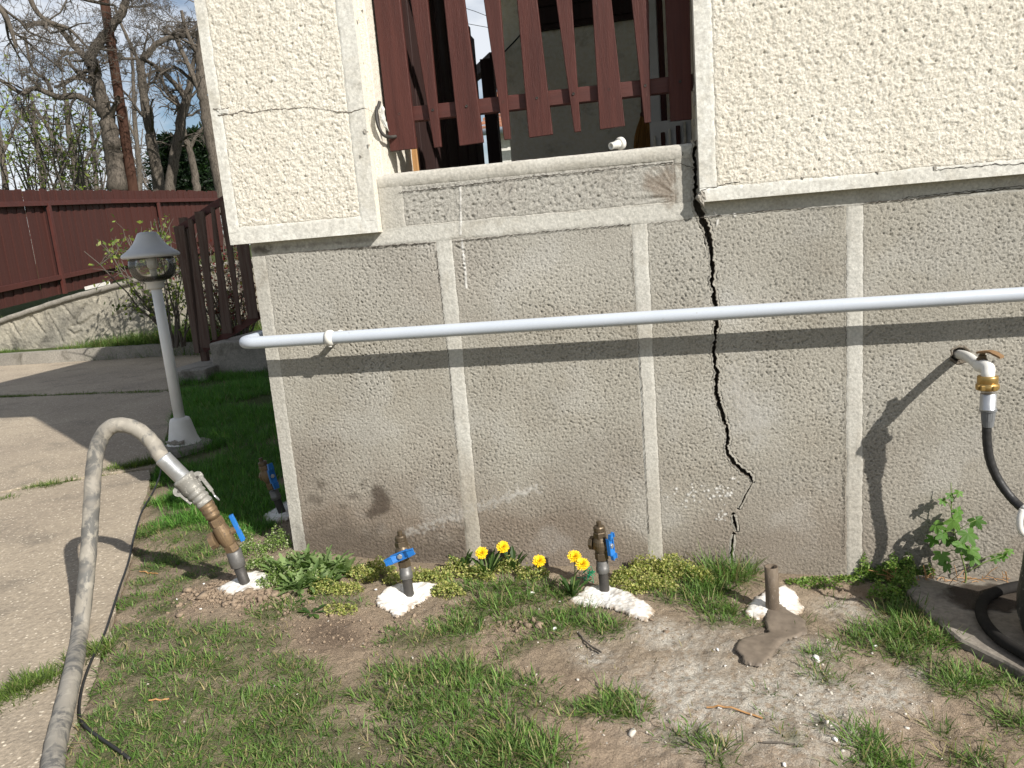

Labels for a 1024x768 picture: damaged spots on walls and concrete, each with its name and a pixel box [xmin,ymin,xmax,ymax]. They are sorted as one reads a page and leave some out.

damp [368,486,389,517]
crack [305,140,1024,563]